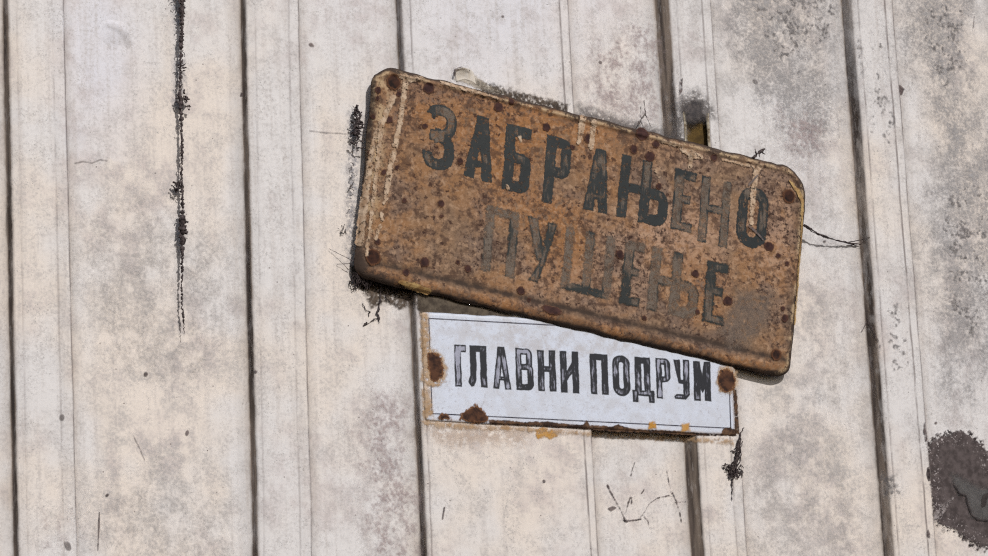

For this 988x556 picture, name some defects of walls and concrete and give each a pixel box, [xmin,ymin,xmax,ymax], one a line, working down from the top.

leakage [928,430,988,552]